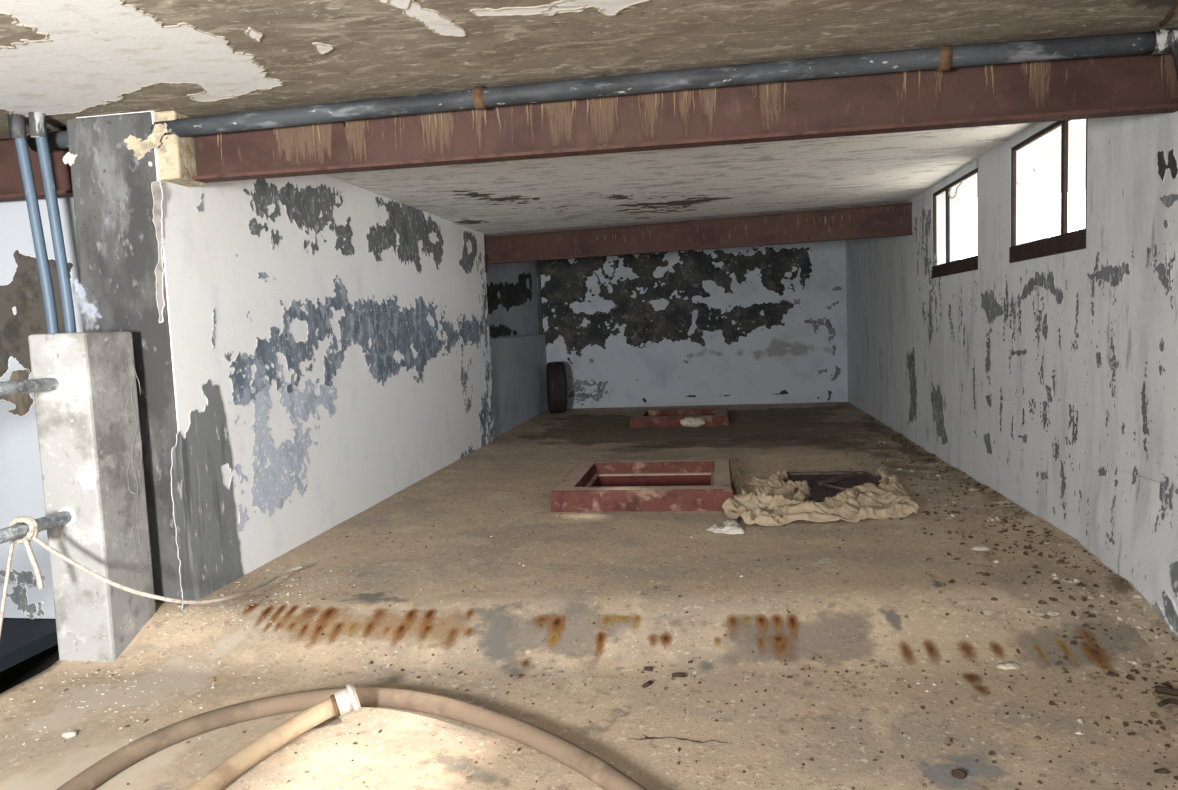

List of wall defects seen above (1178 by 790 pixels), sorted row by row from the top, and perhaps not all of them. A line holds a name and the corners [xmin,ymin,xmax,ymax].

peeling [470,4,587,17]
corrosion [271,119,369,166]
corrosion [419,110,458,156]
corrosion [472,96,623,153]
peeling [243,179,444,274]
peeling [0,249,101,417]
peeling [914,147,1178,554]
peeling [171,218,813,611]
corrosion [244,603,474,646]
corrosion [596,615,640,653]
corrosion [728,615,799,659]
peeling [1150,561,1178,640]